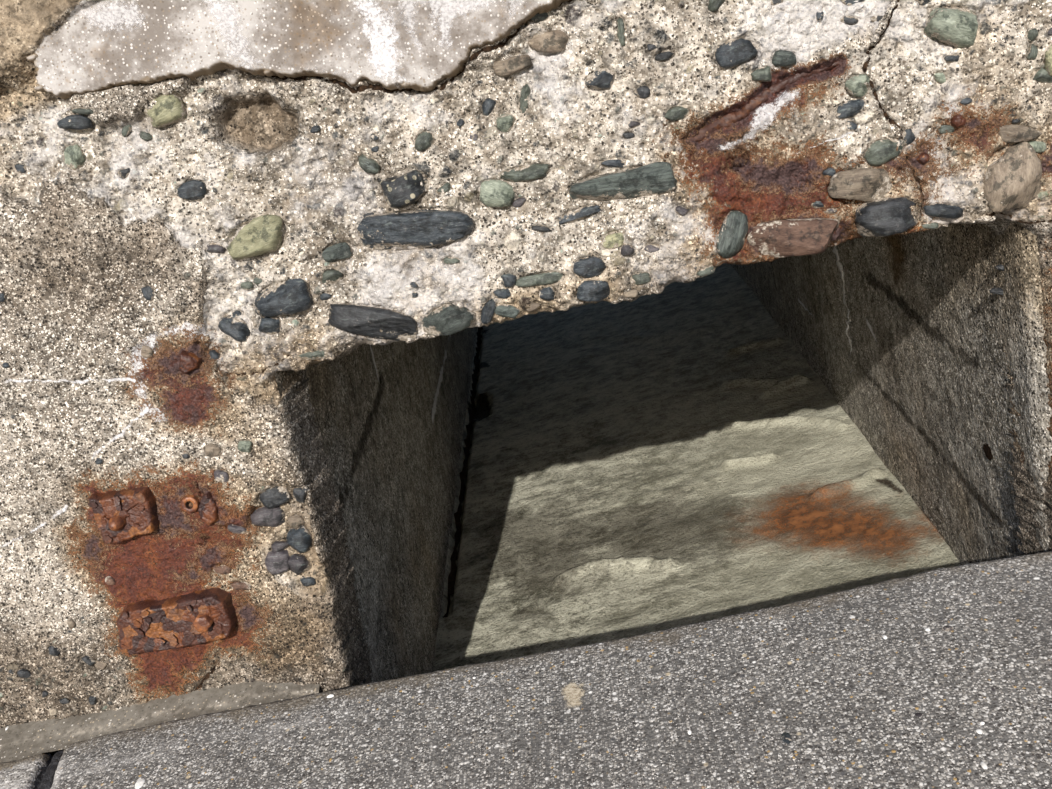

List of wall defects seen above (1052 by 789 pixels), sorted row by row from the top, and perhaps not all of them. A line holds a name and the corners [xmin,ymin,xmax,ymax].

crack [265,26,523,93]
corrosion [652,48,1019,266]
crack [862,0,924,215]
corrosion [1037,132,1052,202]
corrosion [58,451,283,701]
corrosion [119,322,241,440]
crack [431,335,451,424]
crack [443,326,483,617]
corrosion [753,484,937,556]
corrosion [1041,239,1052,437]